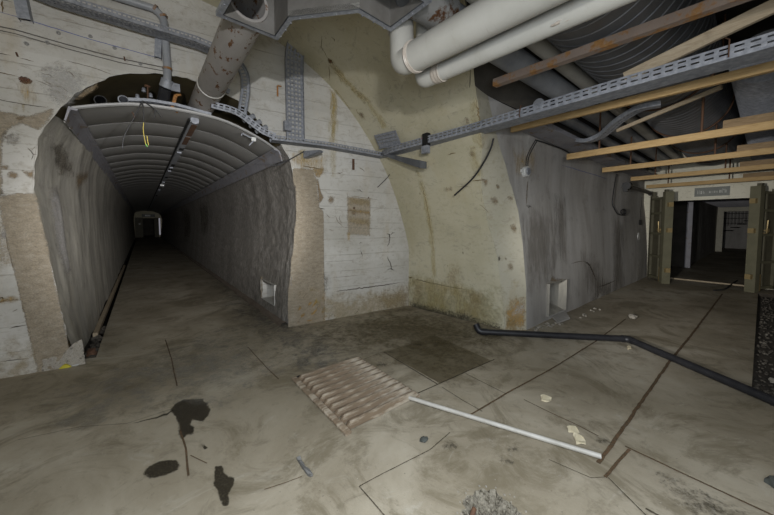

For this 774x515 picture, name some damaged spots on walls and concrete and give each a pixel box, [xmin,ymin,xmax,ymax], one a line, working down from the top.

peeling [0,109,86,372]
peeling [288,168,325,327]
leakage [299,296,526,361]
leakage [136,399,210,439]
leakage [144,460,179,478]
leakage [214,466,234,506]
spalling [456,479,527,515]